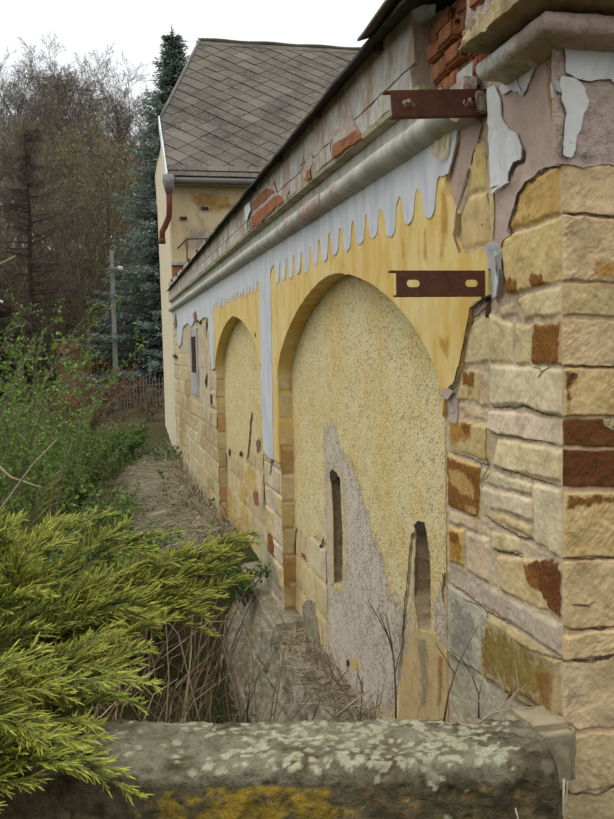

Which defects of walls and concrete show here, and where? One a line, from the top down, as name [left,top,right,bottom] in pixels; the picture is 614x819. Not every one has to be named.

flaking render [426,0,487,89]
flaking render [328,118,363,157]
flaking render [244,182,284,232]
flaking render [442,48,614,424]
peeling [323,420,448,721]